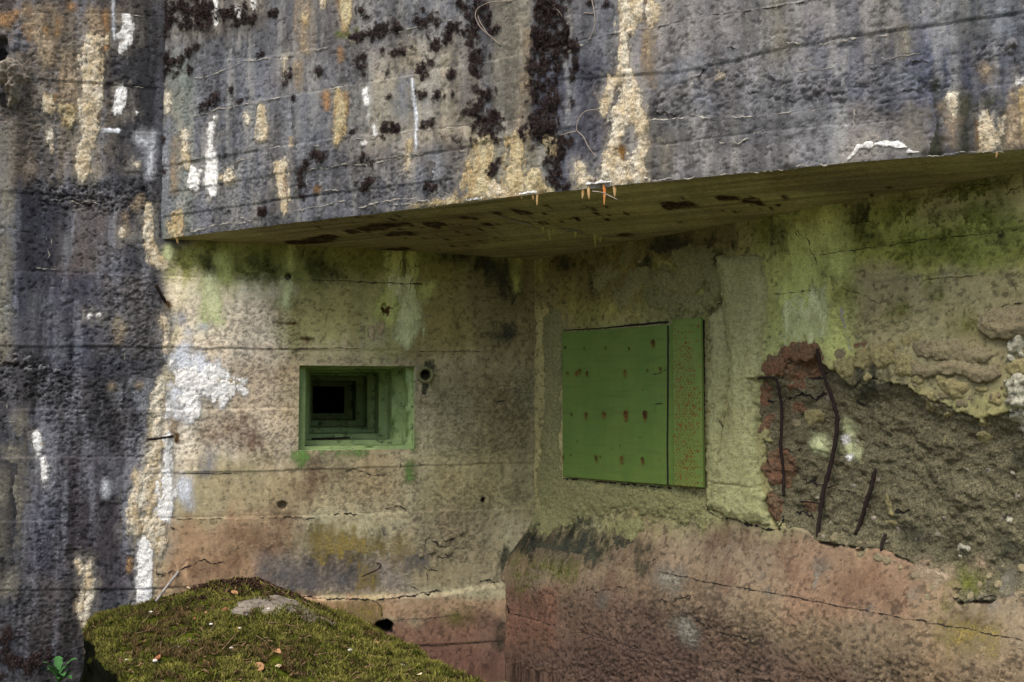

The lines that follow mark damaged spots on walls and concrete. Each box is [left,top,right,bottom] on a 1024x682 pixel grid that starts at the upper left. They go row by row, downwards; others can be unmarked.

water stain [0,57,29,107]
water stain [21,0,138,183]
water stain [273,0,628,304]
water stain [847,69,1024,159]
water stain [661,198,697,223]
water stain [716,196,787,213]
water stain [782,286,827,346]
water stain [103,306,249,603]
spalling [757,304,1024,603]
crack [259,505,409,520]
crack [302,537,464,620]
crack [656,571,1020,643]